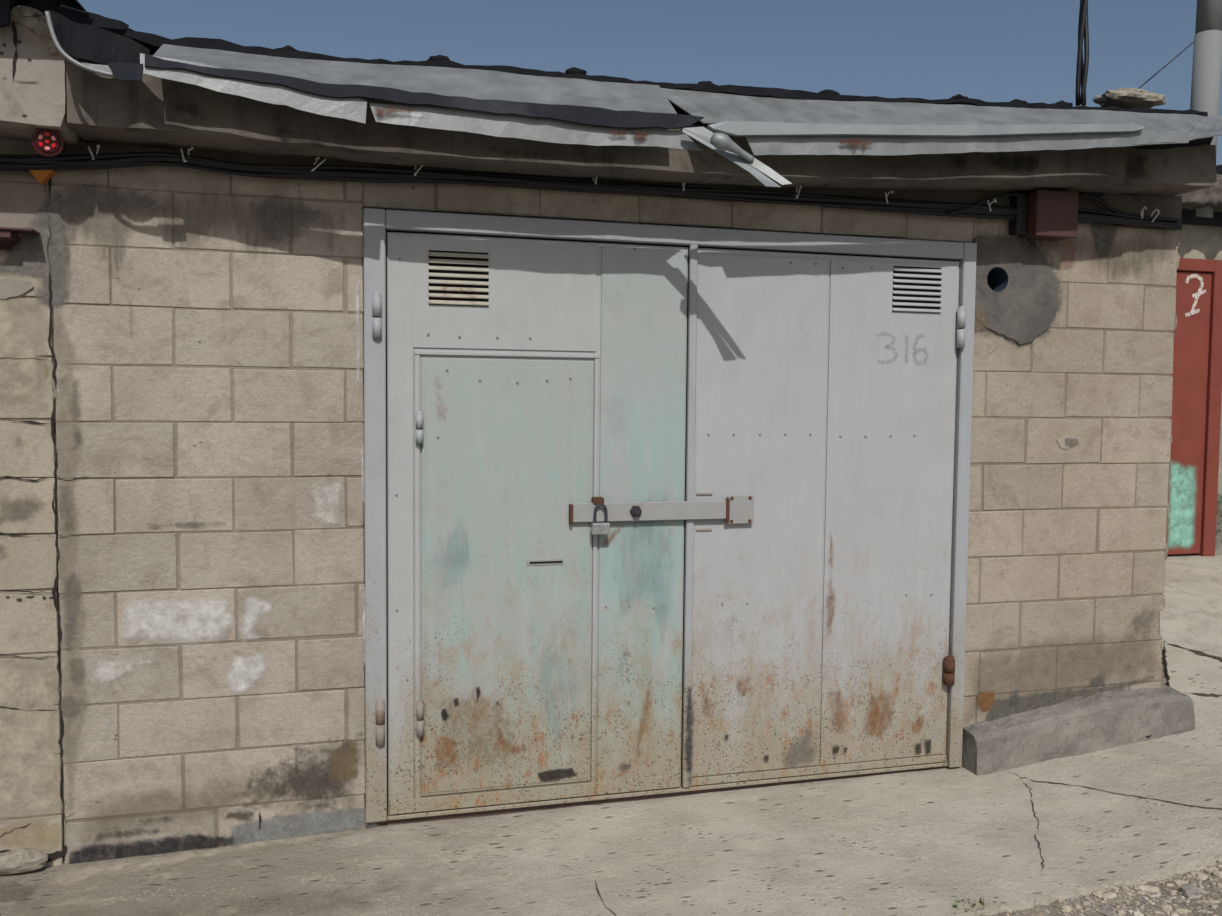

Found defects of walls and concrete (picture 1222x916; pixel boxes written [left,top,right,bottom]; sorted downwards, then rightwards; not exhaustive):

crack [12,21,34,83]
crack [0,186,84,863]
damp [125,597,272,642]
damp [228,654,265,692]
crack [1167,643,1222,661]
crack [1186,690,1222,698]
rust [437,687,523,765]
rust [916,719,931,753]
damp [227,744,352,820]
rust [538,768,576,781]
crack [1013,773,1222,875]